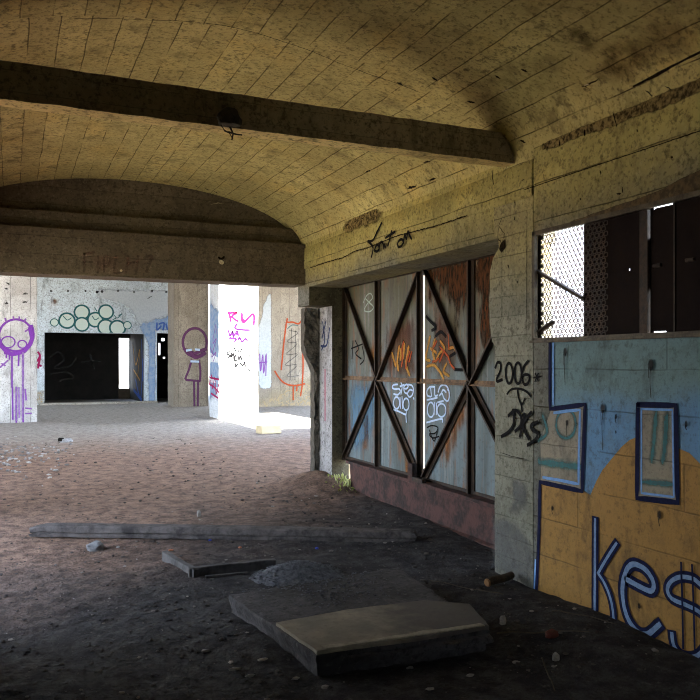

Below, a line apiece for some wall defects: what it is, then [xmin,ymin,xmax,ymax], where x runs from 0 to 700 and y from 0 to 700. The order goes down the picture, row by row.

crack [633,51,700,96]
spalling [542,78,700,149]
spalling [344,209,381,233]
rust [428,255,495,363]